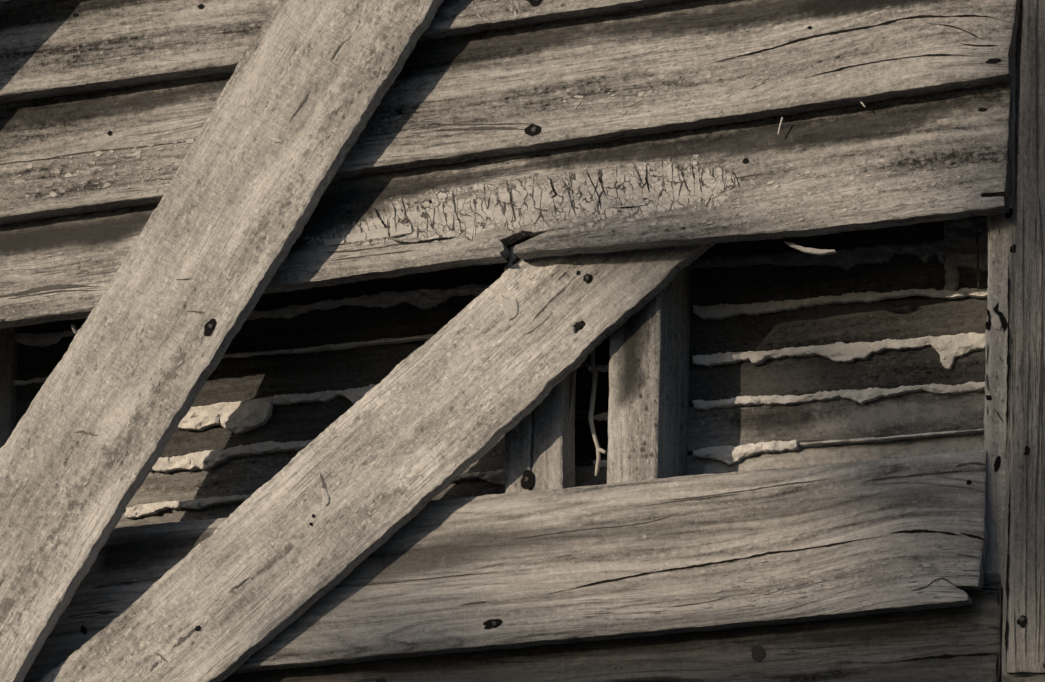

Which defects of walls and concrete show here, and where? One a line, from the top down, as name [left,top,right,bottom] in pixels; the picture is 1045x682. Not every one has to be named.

crack [702,15,1008,78]
crack [1032,0,1040,167]
crack [599,169,651,209]
crack [681,165,759,199]
crack [502,271,576,337]
crack [517,198,1045,682]
crack [346,572,491,587]